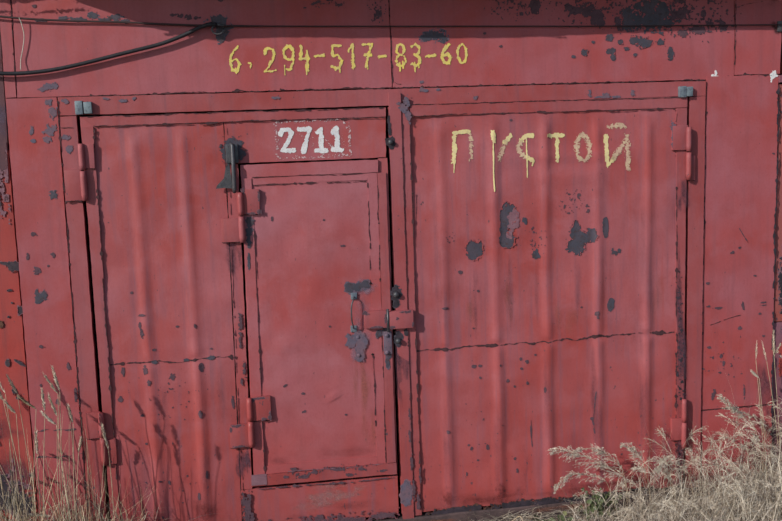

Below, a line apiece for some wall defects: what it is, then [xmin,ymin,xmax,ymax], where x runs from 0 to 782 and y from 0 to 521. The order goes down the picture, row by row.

peeling [484,0,741,61]
peeling [0,142,10,224]
peeling [464,239,484,261]
peeling [498,201,547,259]
peeling [559,189,609,256]
peeling [34,288,48,304]
peeling [344,279,371,295]
peeling [345,284,414,362]
peeling [0,458,36,521]
peeling [283,463,387,479]